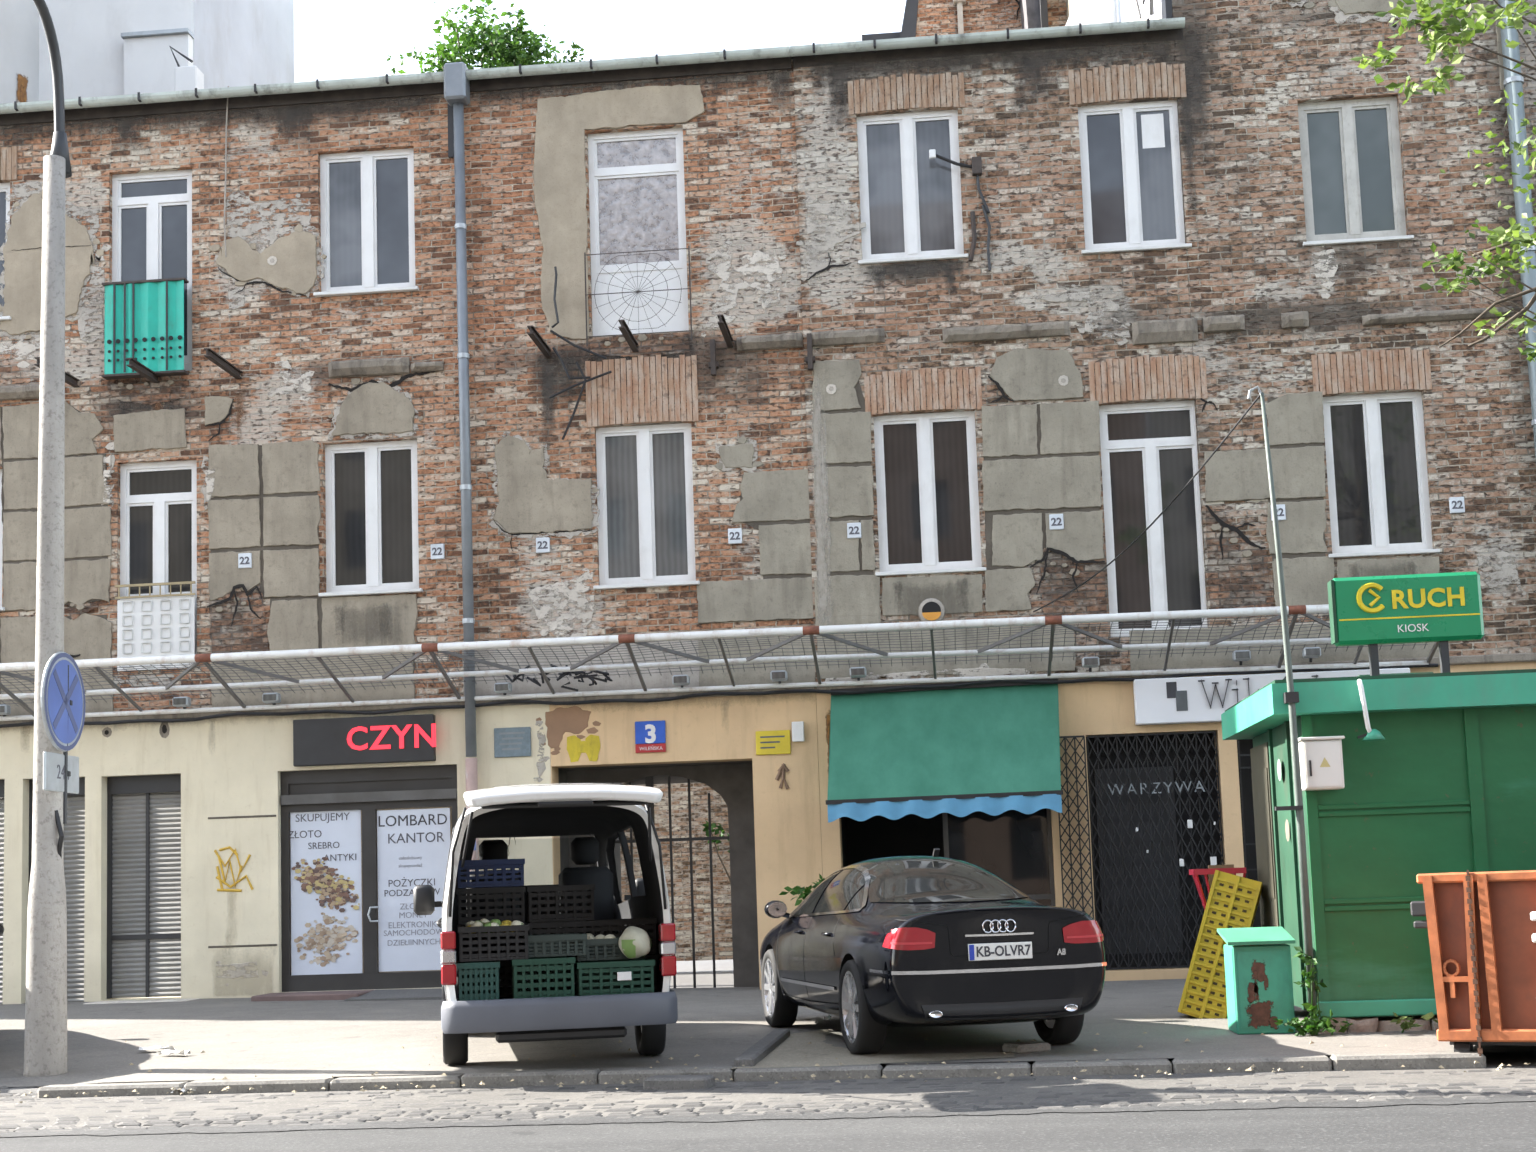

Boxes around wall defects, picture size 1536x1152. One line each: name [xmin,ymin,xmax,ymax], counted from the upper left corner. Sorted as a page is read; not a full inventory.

peeling [1270,0,1469,30]
peeling [0,174,43,368]
peeling [65,193,112,349]
peeling [209,188,327,318]
peeling [590,196,866,357]
peeling [328,378,424,441]
crack [207,584,262,626]
peeling [488,428,600,542]
crack [1030,547,1105,593]
crack [1205,505,1265,560]